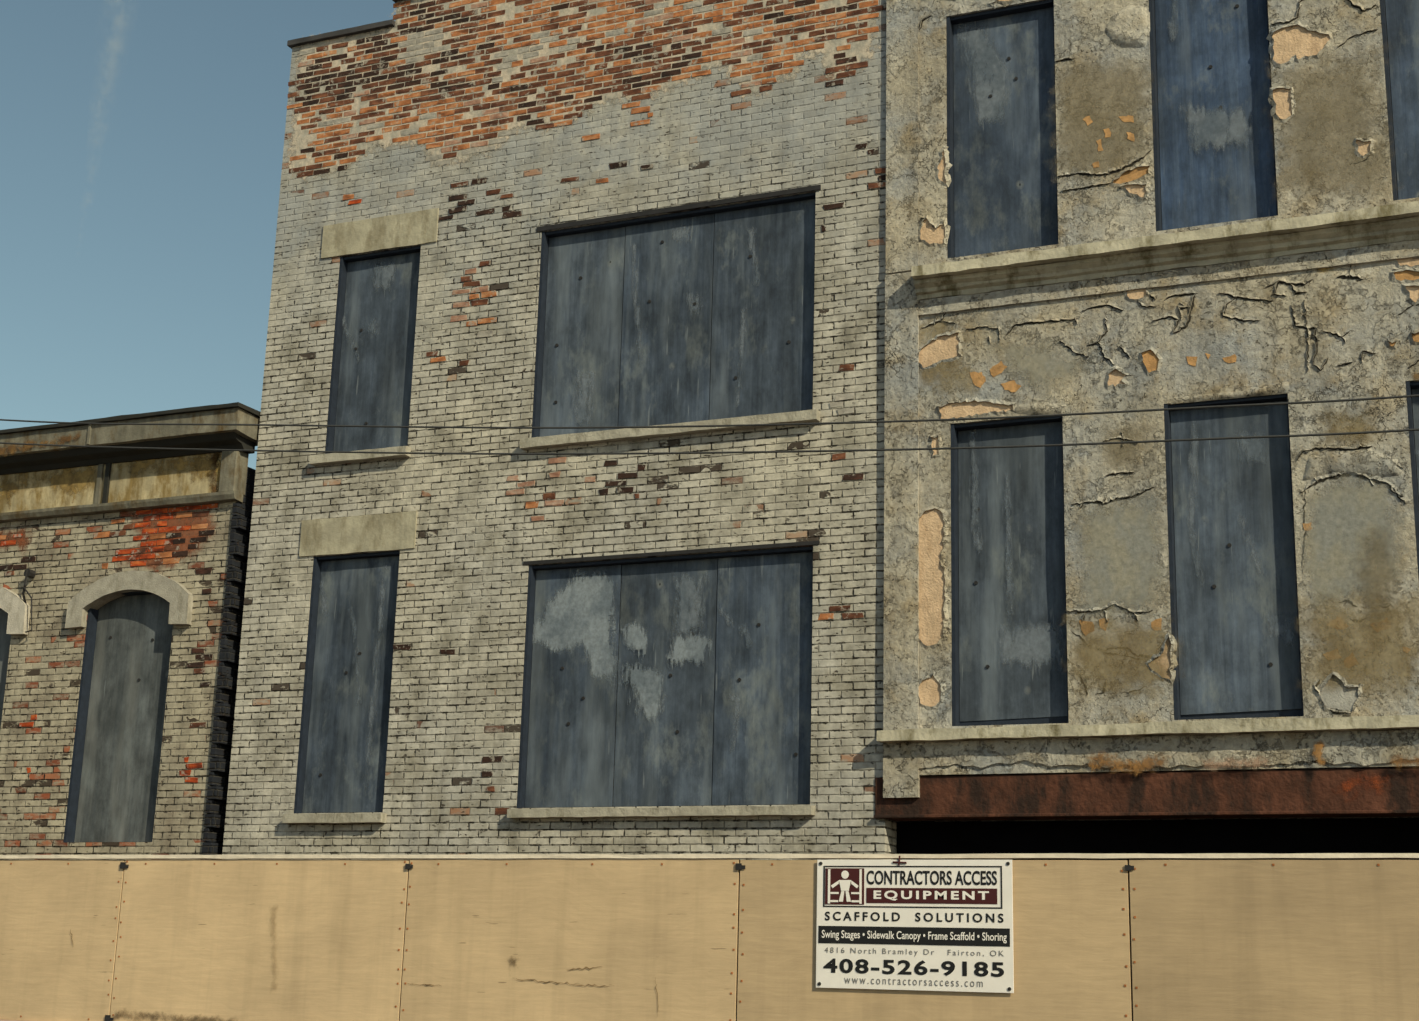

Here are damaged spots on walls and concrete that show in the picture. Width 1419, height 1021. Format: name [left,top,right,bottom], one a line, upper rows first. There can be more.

peeling [287,0,887,189]
flaking render [1266,21,1333,124]
spalling [439,178,521,221]
crack [1058,150,1151,191]
crack [922,257,1419,372]
flaking render [927,361,1021,458]
peeling [94,503,218,594]
flaking render [918,506,950,649]
crack [1072,431,1154,509]
crack [1296,443,1407,573]
crack [1067,600,1164,695]
rust [1090,753,1165,776]